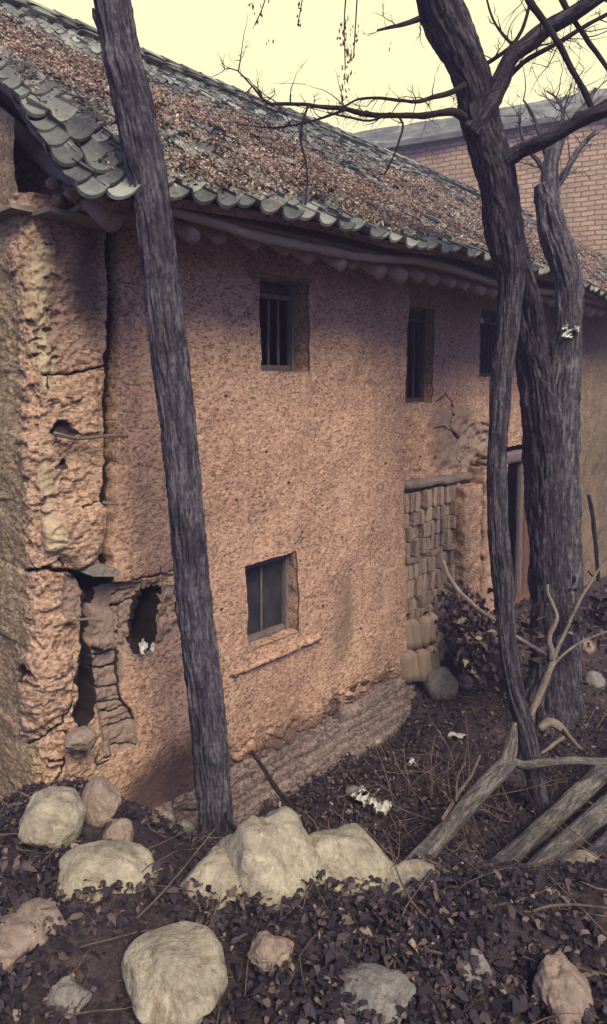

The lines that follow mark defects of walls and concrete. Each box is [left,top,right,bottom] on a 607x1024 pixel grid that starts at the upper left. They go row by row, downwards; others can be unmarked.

spalling [49,420,81,440]
crack [42,231,113,509]
spalling [456,420,489,471]
crack [26,554,179,779]
spalling [68,570,181,754]
spalling [334,680,370,714]